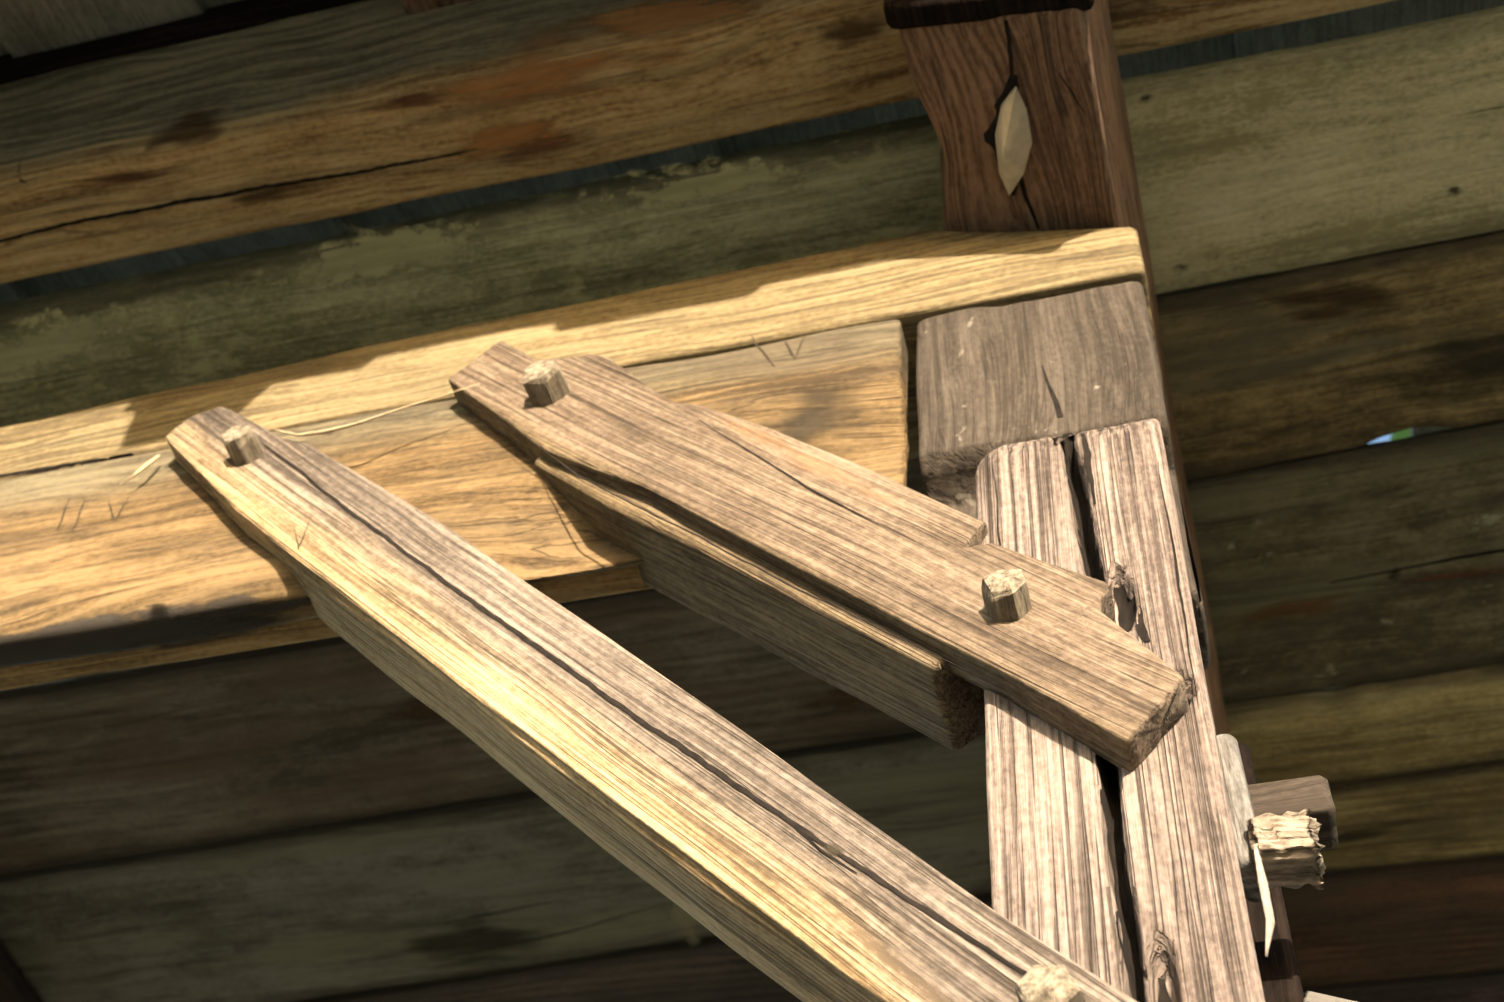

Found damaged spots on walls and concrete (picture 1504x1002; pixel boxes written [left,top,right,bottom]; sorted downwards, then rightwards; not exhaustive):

crack [1004,20,1014,86]
leakage [149,111,218,147]
leakage [86,172,169,183]
crack [0,149,477,243]
crack [1019,177,1040,229]
leakage [779,387,847,442]
crack [1042,365,1104,582]
crack [1329,549,1504,583]
leakage [0,594,311,668]
crack [264,411,1027,975]
crack [1095,755,1145,1002]